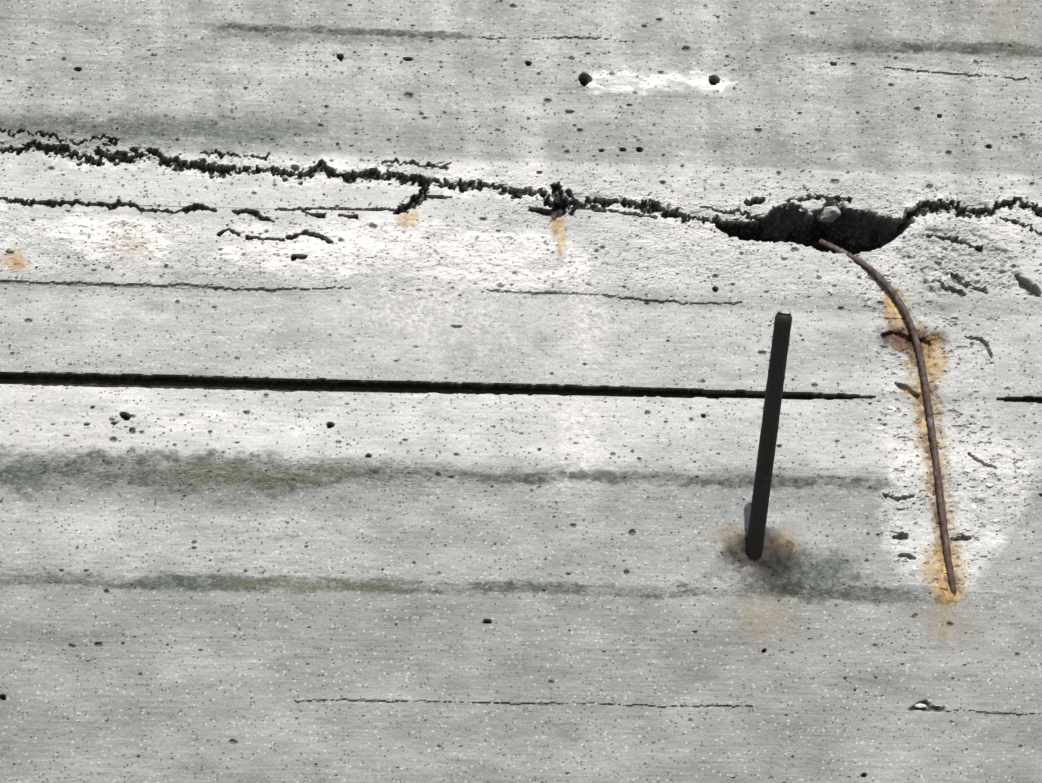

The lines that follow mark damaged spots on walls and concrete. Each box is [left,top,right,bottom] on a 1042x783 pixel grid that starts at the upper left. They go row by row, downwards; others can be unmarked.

crack [0,127,854,261]
crack [902,194,1042,253]
crack [0,278,351,293]
crack [486,288,744,305]
spalling [838,223,1042,603]
rust [882,297,960,599]
rust [726,530,791,588]